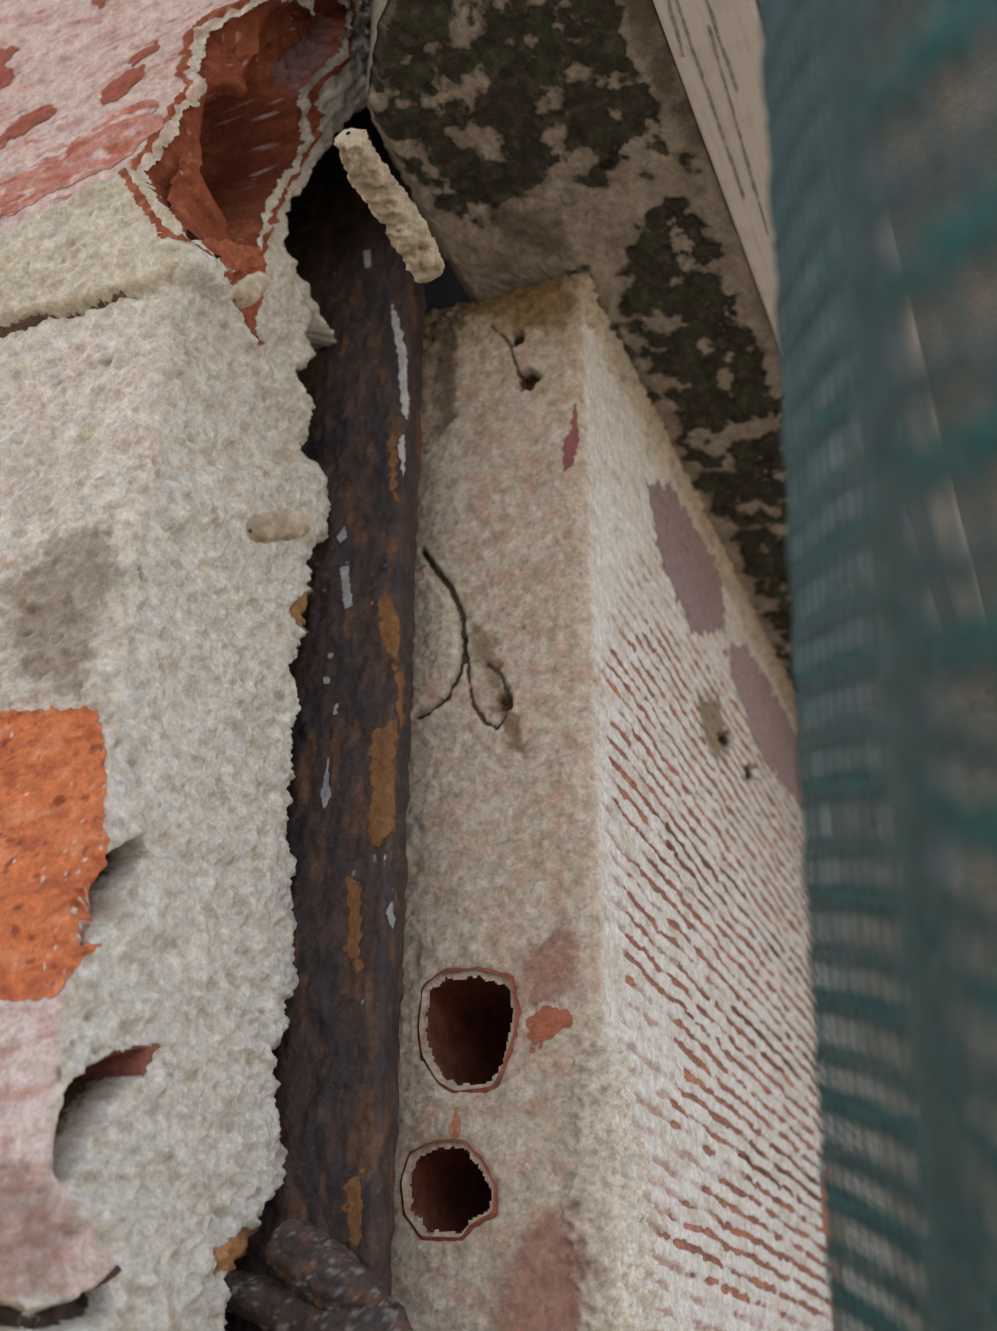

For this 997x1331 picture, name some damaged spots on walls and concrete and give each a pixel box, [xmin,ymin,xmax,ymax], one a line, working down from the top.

spalling [0,0,358,286]
spalling [236,295,265,345]
peeling [363,249,372,268]
leakage [369,0,702,430]
leakage [613,197,858,691]
corrosion [290,587,313,634]
corrosion [366,597,405,848]
leakage [646,479,805,811]
peeling [0,706,113,1001]
leakage [523,935,573,1053]
corrosion [214,1216,263,1278]
corrosion [341,1167,366,1247]